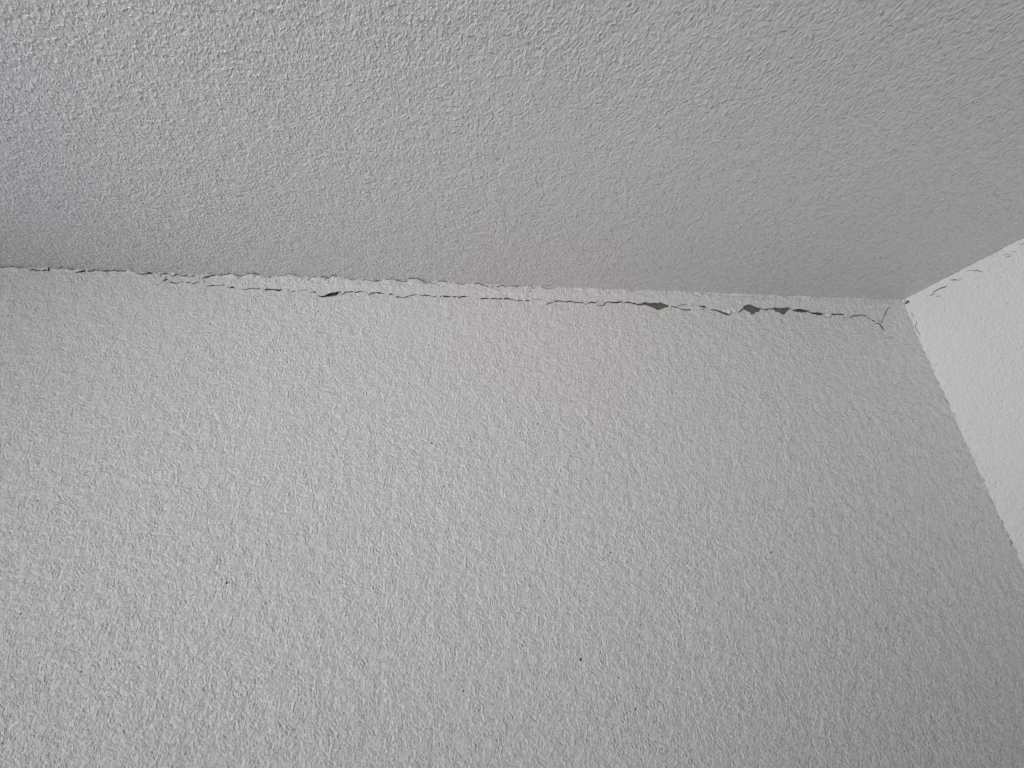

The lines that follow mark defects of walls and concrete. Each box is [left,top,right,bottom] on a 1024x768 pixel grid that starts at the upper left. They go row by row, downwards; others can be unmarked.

crack [1,266,636,306]
flaking render [636,302,668,310]
flaking render [743,304,760,314]
flaking render [773,307,808,315]
crack [667,270,983,337]